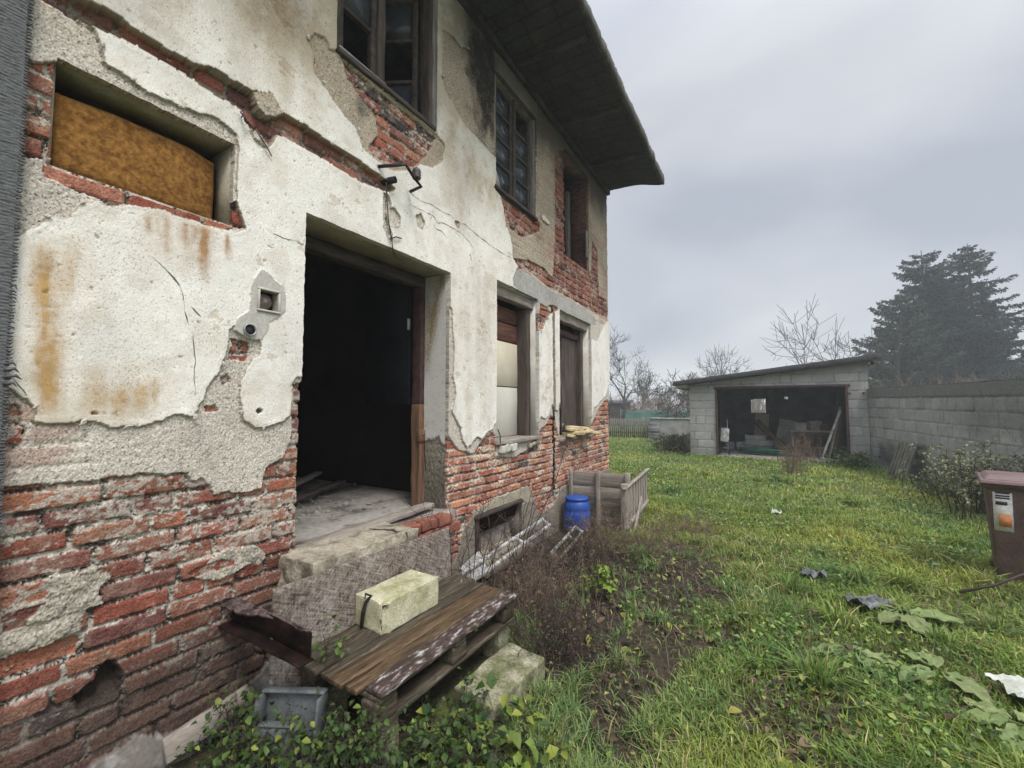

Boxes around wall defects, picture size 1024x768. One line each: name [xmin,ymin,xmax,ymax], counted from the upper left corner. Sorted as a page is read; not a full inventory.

flaking render [0,329,301,768]